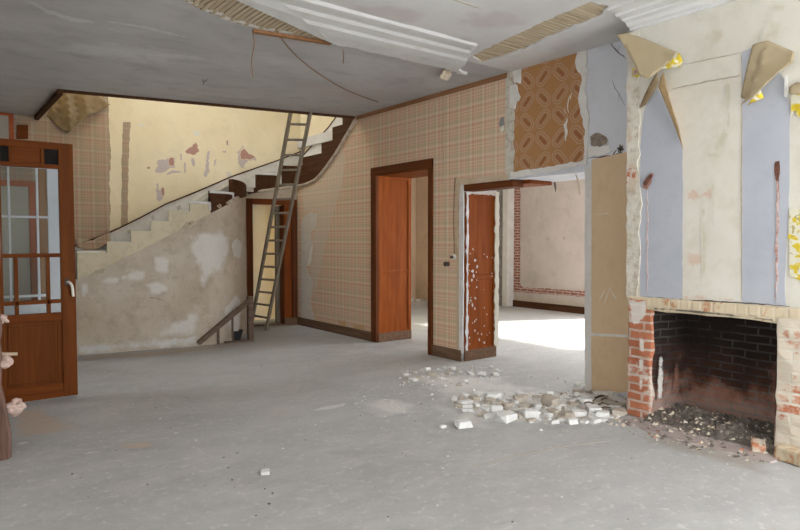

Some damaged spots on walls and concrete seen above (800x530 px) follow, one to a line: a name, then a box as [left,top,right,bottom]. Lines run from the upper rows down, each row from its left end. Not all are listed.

flaking render [182,0,323,43]
flaking render [474,2,607,62]
peeling [147,140,228,202]
peeling [236,145,258,169]
peeling [625,50,643,297]
peeling [78,253,173,300]
peeling [179,219,242,294]
peeling [301,212,317,320]
corrosion [641,171,655,293]